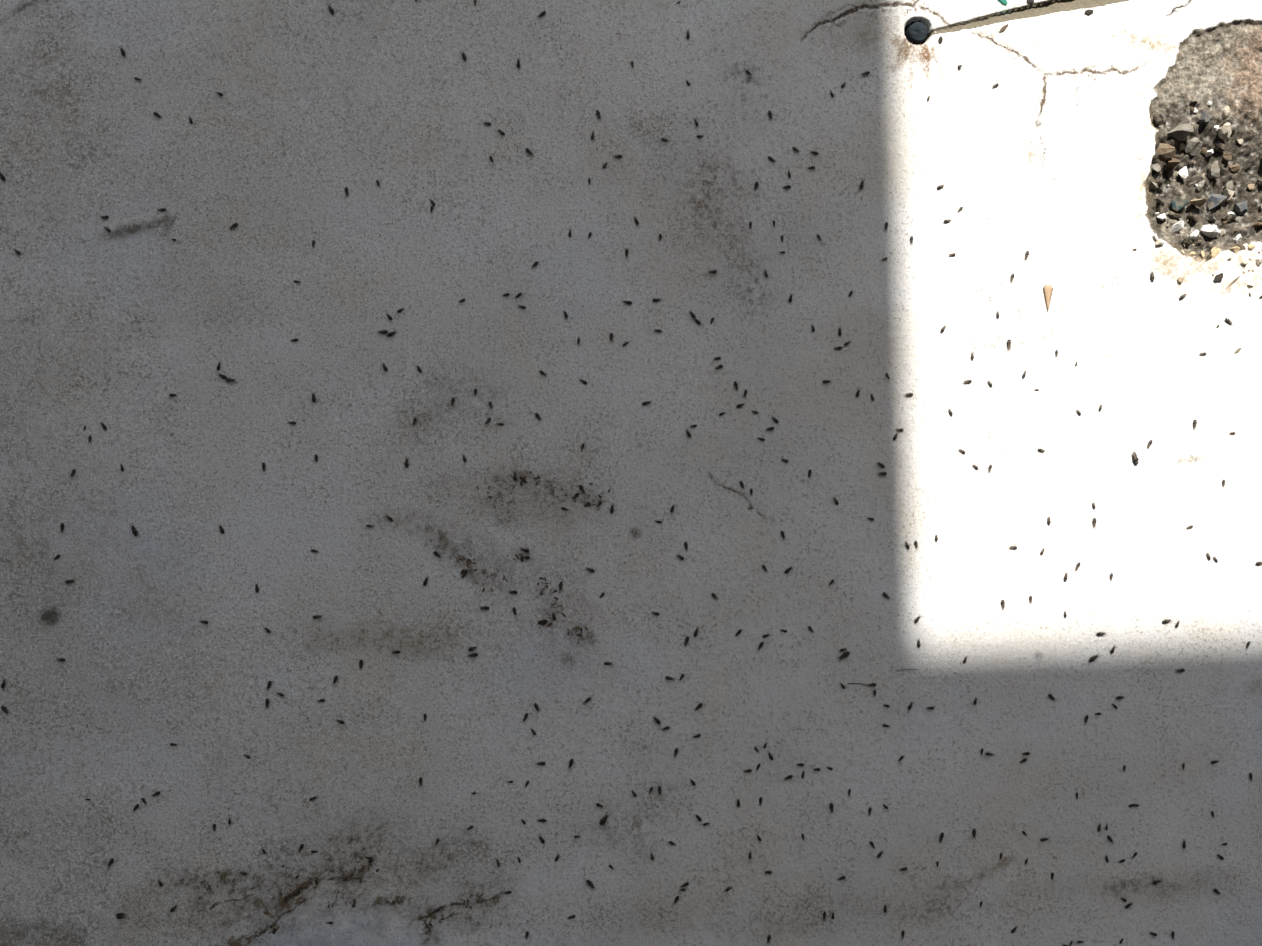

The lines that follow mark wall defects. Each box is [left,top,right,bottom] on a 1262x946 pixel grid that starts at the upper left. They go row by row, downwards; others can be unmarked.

crack [807,0,948,34]
crack [977,32,1139,116]
spalling [1143,19,1262,275]